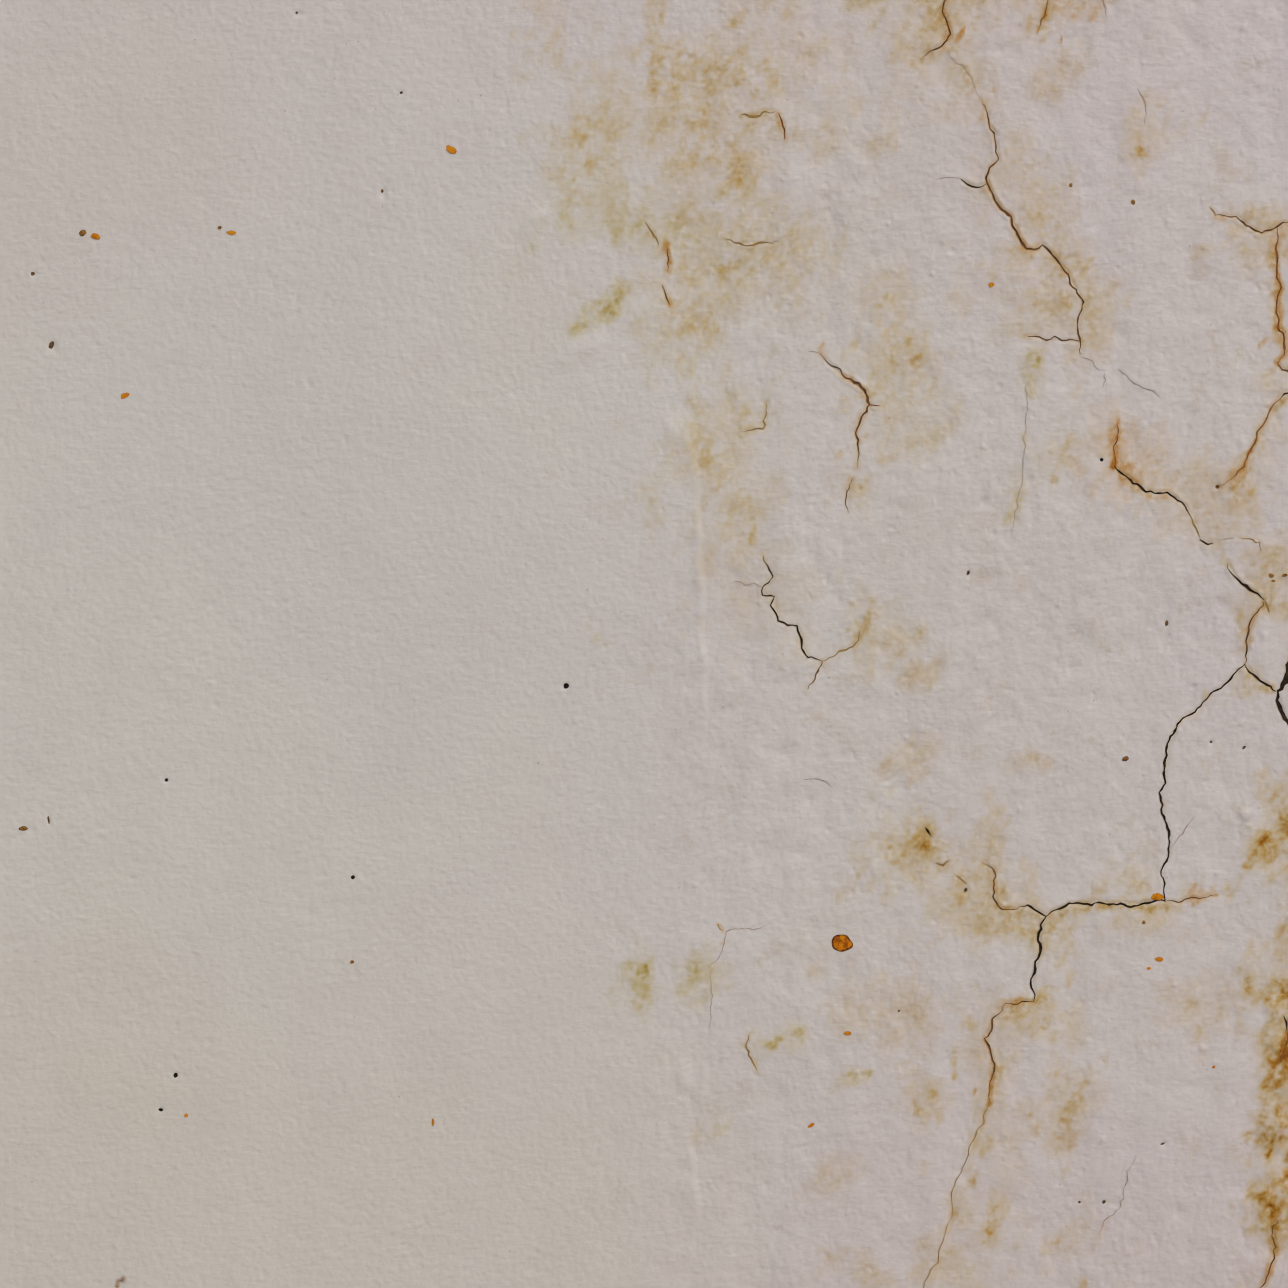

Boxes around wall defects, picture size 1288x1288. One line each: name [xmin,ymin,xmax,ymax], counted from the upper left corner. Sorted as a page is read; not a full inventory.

crack [742,111,785,138]
crack [923,0,1159,396]
crack [1211,208,1288,487]
crack [811,351,879,509]
crack [1012,380,1030,529]
crack [732,556,860,688]
crack [923,425,1288,1288]
corrosion [832,935,853,952]